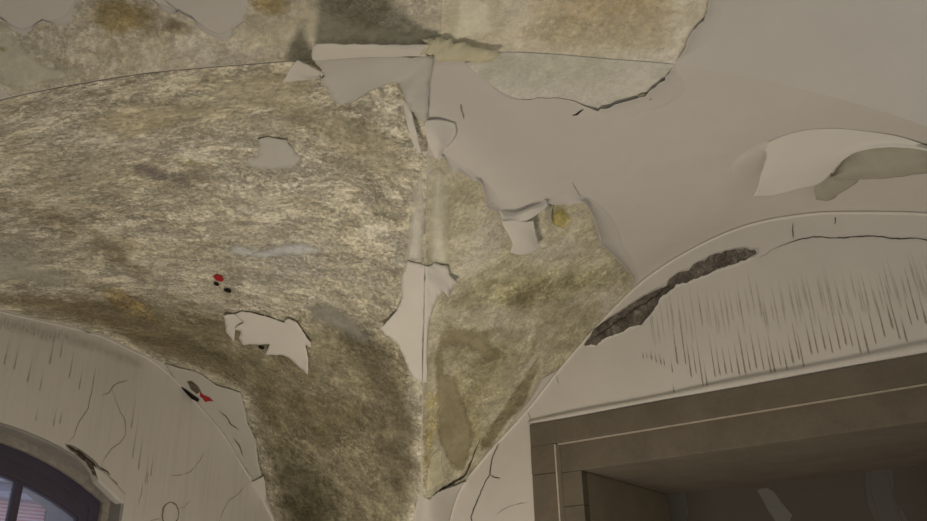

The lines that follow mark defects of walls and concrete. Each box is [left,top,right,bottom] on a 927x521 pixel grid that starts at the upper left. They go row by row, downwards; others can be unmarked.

flaking render [0,0,725,123]
flaking render [0,60,758,521]
damp [0,289,411,521]
damp [423,329,536,485]
crack [470,444,500,521]